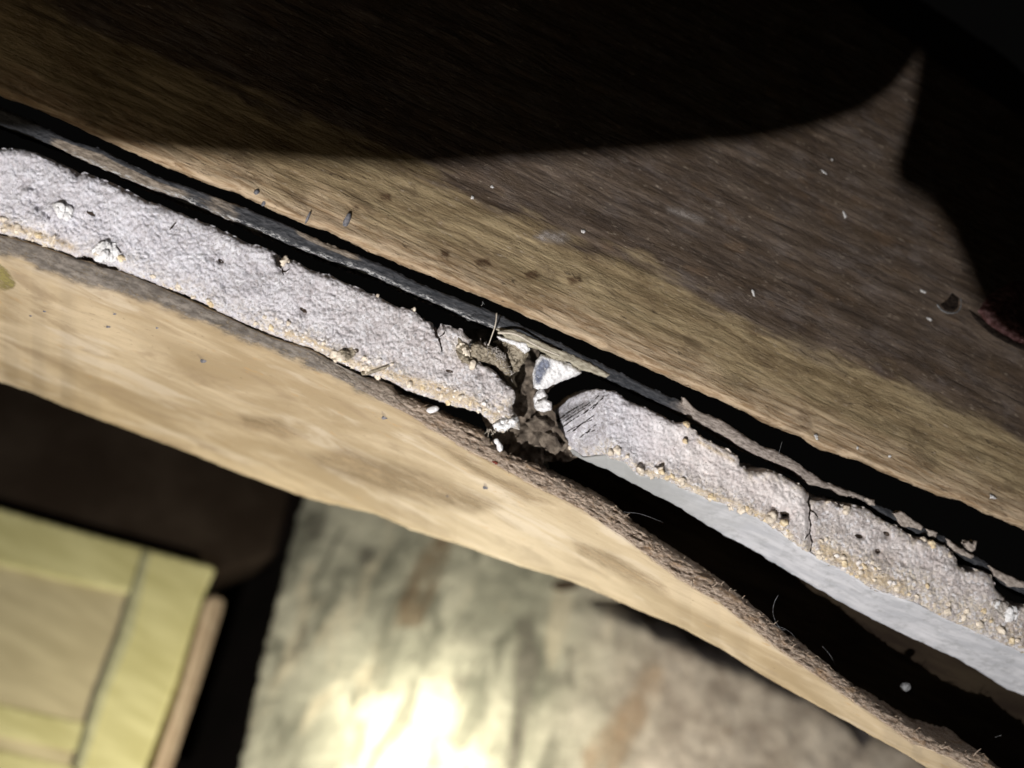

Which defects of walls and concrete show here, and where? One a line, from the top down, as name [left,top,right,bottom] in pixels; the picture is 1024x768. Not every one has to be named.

spalling [446,337,476,373]
peeling [495,328,610,378]
crack [805,493,818,552]